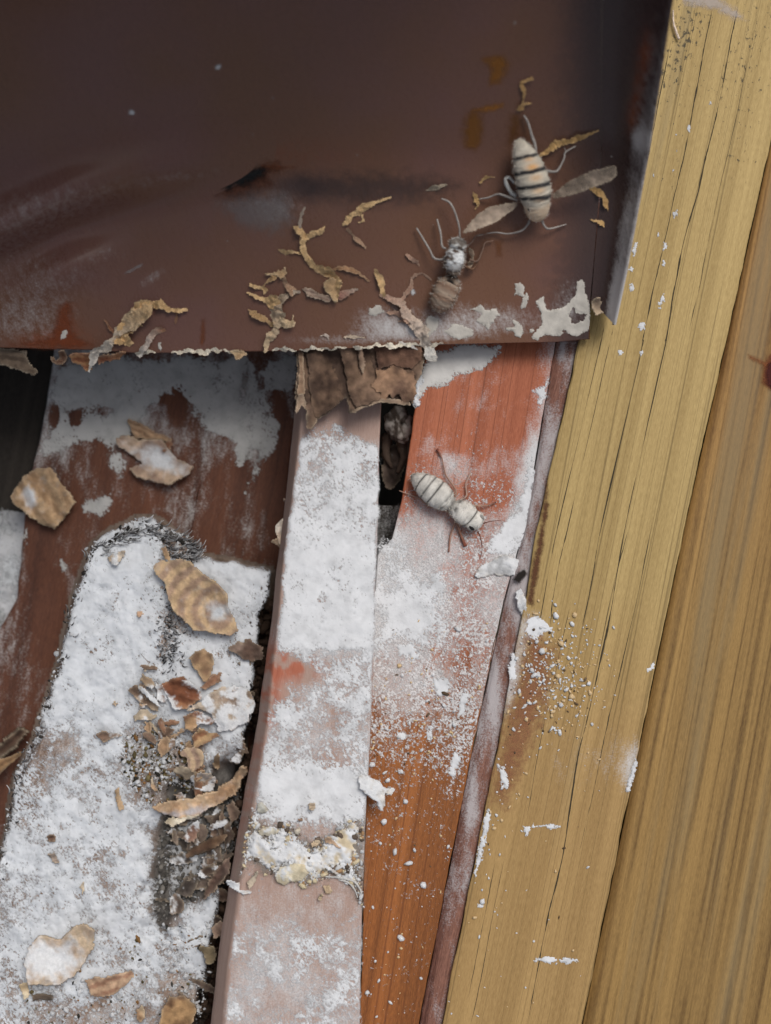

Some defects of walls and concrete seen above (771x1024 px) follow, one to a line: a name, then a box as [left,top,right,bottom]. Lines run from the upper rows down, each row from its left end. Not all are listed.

rust [224,166,279,197]
rust [24,304,87,348]
peeling [368,305,384,317]
peeling [425,304,500,340]
peeling [506,280,590,341]
peeling [230,349,248,360]
damp [120,728,194,804]